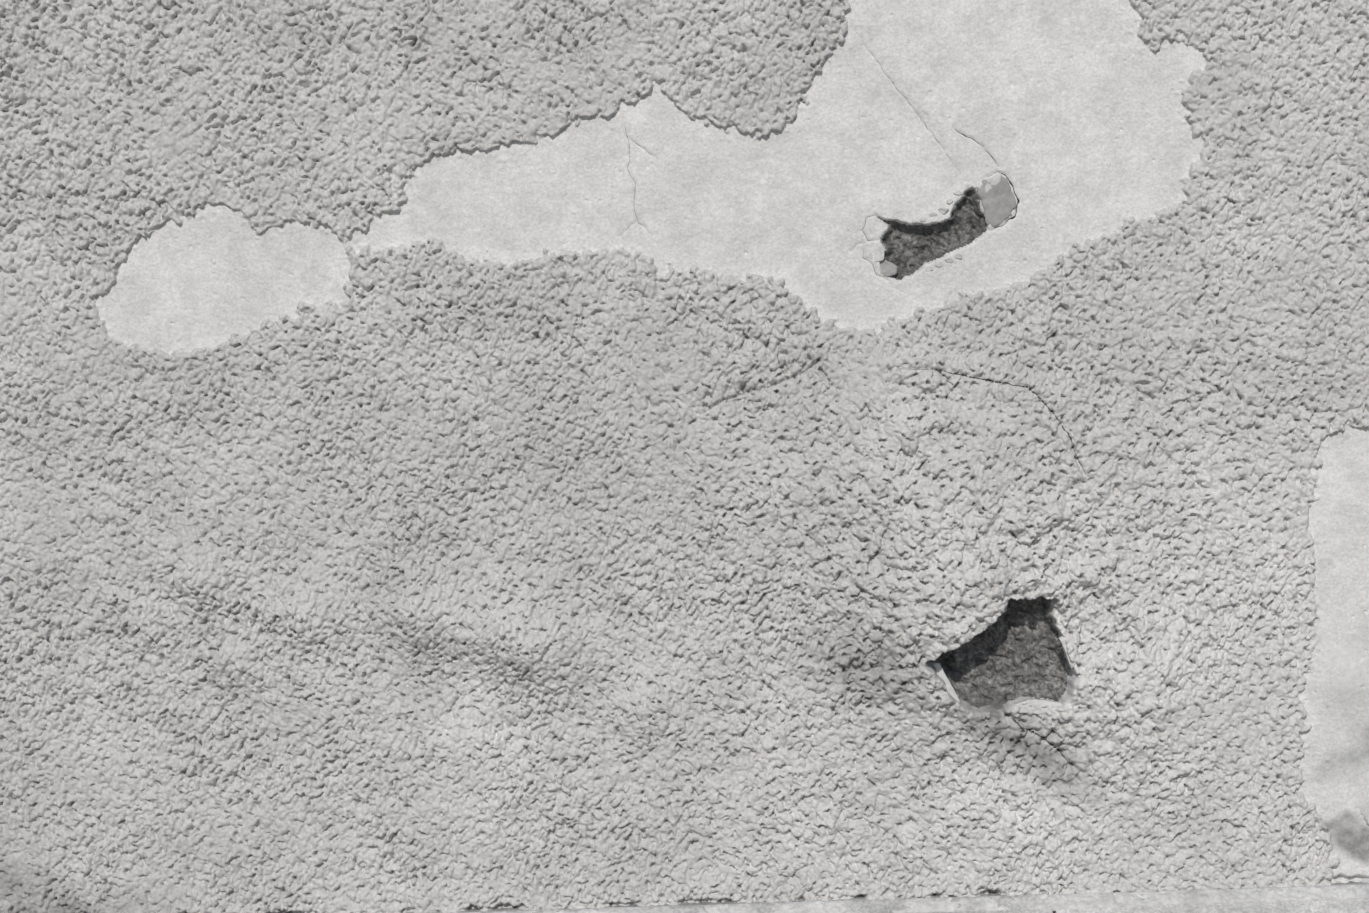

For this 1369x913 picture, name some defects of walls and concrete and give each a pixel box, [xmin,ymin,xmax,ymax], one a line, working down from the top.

peeling [96,0,1207,355]
spalling [930,596,1077,714]
peeling [1297,421,1369,883]